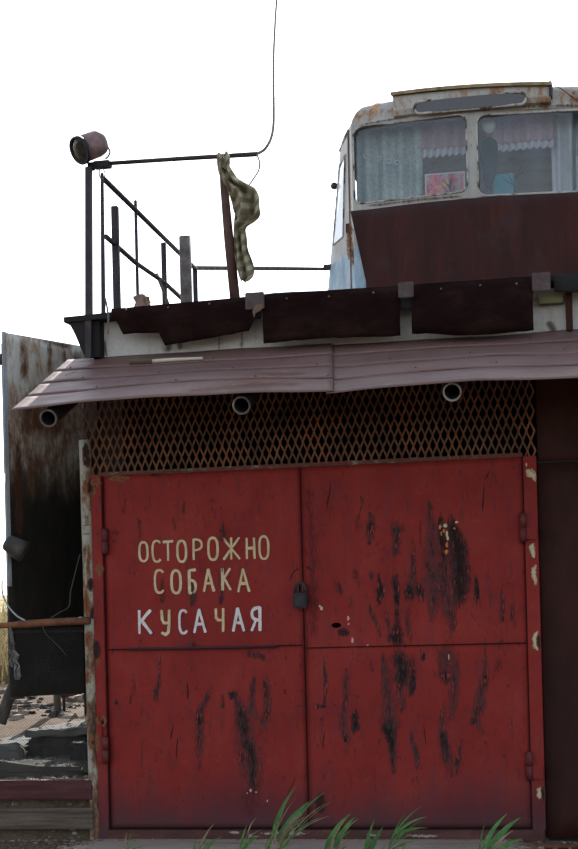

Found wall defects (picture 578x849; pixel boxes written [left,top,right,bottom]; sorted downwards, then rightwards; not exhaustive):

spalling [528,543,538,586]
peeling [221,674,272,794]
peeling [368,501,480,778]
peeling [471,635,502,736]
spalling [532,631,541,651]